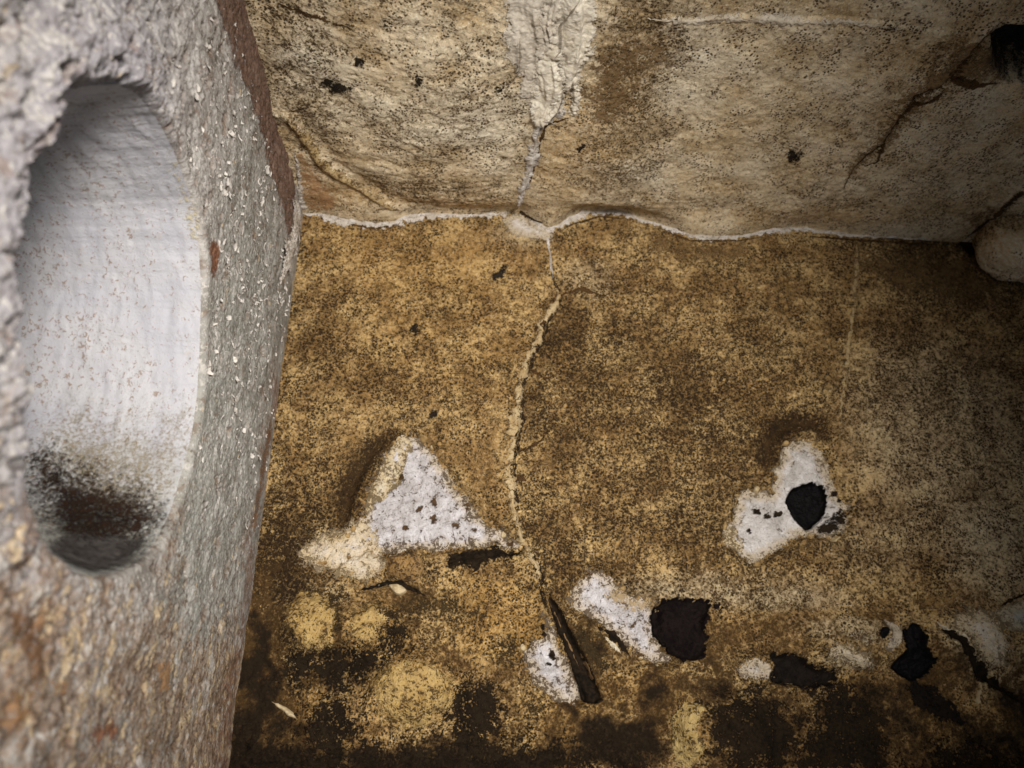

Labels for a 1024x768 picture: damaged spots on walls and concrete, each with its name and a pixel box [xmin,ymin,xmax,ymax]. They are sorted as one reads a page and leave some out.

crack [844,29,997,187]
crack [304,106,1024,704]
water stain [25,415,189,546]
spalling [295,431,521,595]
spalling [721,438,853,567]
water stain [229,571,672,768]
spalling [516,609,581,706]
spalling [566,565,670,666]
water stain [650,597,724,662]
water stain [681,622,1024,768]
spalling [882,612,903,653]